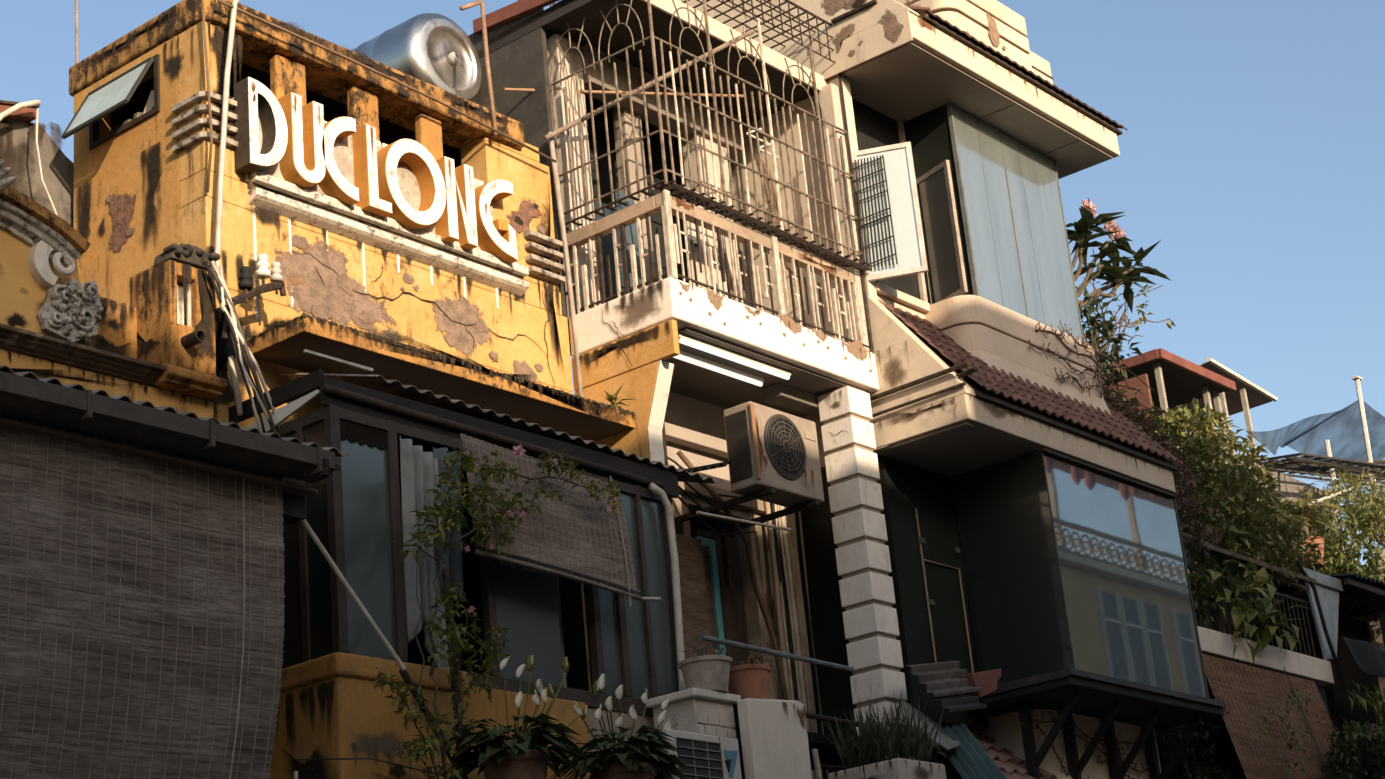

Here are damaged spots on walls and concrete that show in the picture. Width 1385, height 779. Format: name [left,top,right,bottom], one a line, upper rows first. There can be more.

water stain [78,0,317,140]
water stain [334,43,426,99]
peeling [821,0,904,55]
spalling [98,193,136,253]
water stain [141,142,161,241]
water stain [251,207,294,228]
water stain [256,184,310,205]
water stain [0,245,635,418]
peeling [275,234,403,343]
peeling [401,272,419,291]
crack [279,252,555,386]
peeling [432,294,543,382]